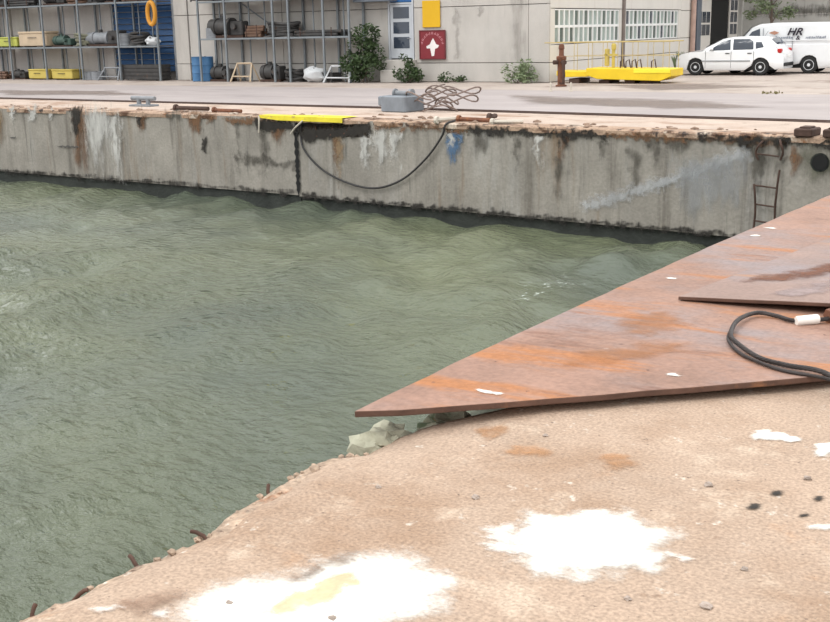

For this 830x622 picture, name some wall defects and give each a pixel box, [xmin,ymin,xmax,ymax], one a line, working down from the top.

leakage [0,107,744,236]
spalling [19,452,375,622]